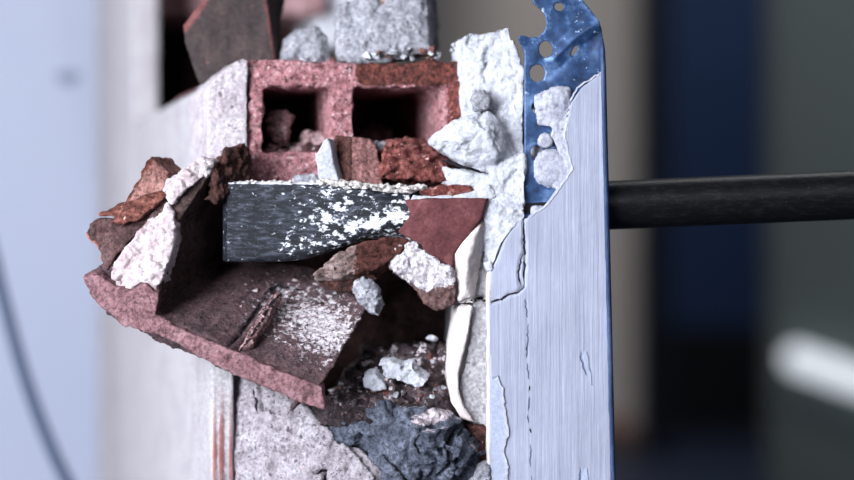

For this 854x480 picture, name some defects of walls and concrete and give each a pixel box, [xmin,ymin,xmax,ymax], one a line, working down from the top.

spalling [83,59,383,480]
spalling [363,367,387,392]
crack [458,219,532,480]
peeling [491,375,509,480]
spalling [411,28,601,272]